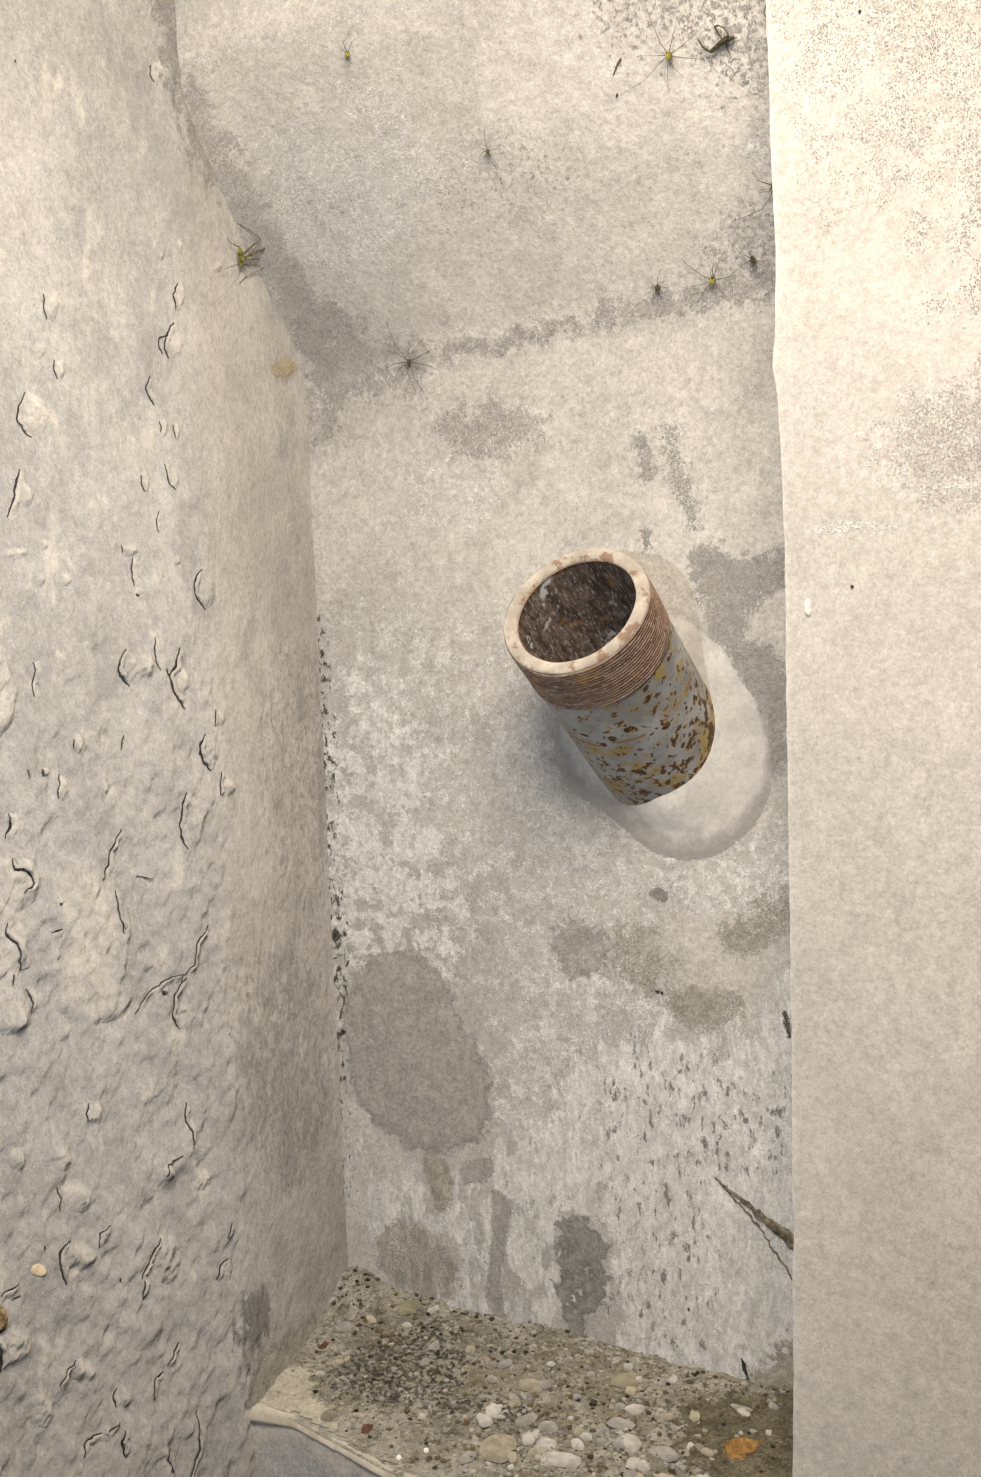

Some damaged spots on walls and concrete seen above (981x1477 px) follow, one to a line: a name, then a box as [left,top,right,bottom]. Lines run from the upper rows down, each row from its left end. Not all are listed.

crack [145,322,184,405]
crack [7,469,33,520]
crack [154,637,225,726]
crack [179,771,236,849]
crack [12,857,40,897]
crack [135,925,209,1029]
damp [221,558,794,1383]
crack [167,1102,197,1177]
crack [142,1234,181,1298]
crack [0,1284,32,1372]
crack [83,1342,181,1458]
crack [167,1406,205,1477]